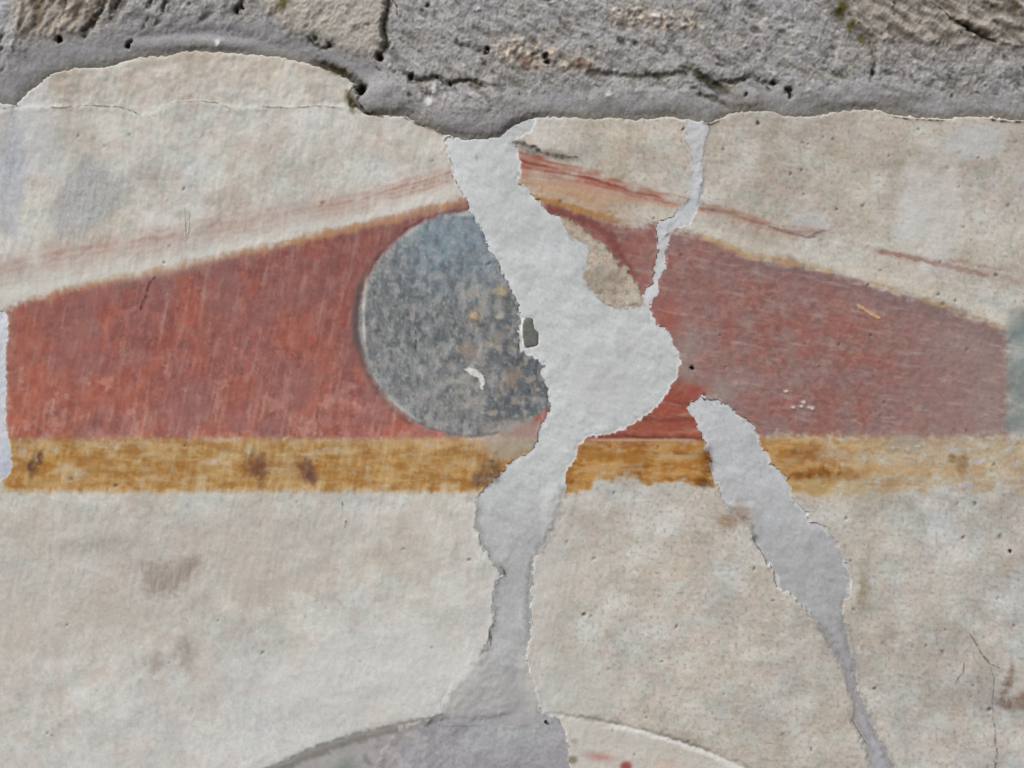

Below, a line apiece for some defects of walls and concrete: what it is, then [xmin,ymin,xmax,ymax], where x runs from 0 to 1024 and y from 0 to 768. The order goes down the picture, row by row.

flaking render [380,118,682,768]
flaking render [687,394,892,768]